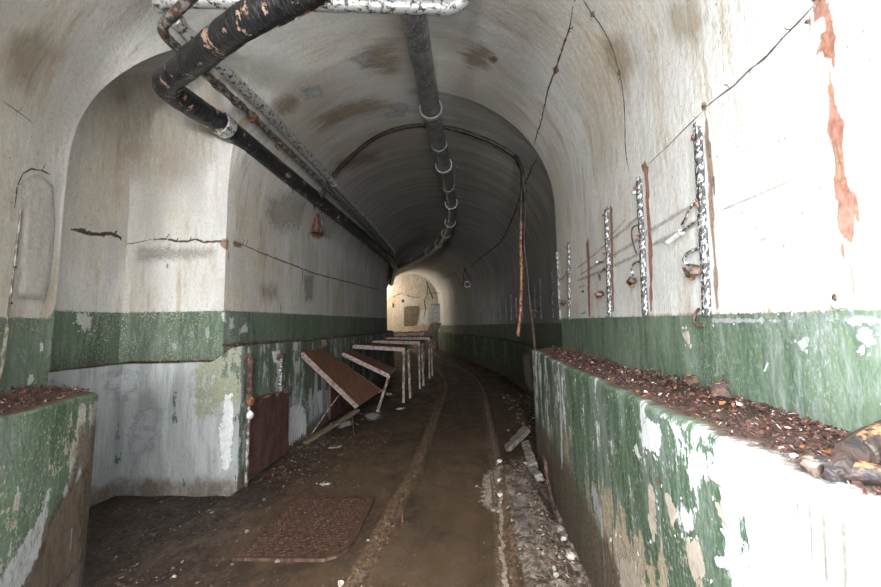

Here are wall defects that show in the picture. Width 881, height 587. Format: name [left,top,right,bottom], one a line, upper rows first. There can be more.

crack [71,0,629,319]
corrosion [641,162,653,317]
corrosion [701,102,718,309]
crack [650,0,820,163]
corrosion [805,0,860,298]
peeling [72,310,95,335]
peeling [633,413,687,461]
peeling [610,532,648,587]